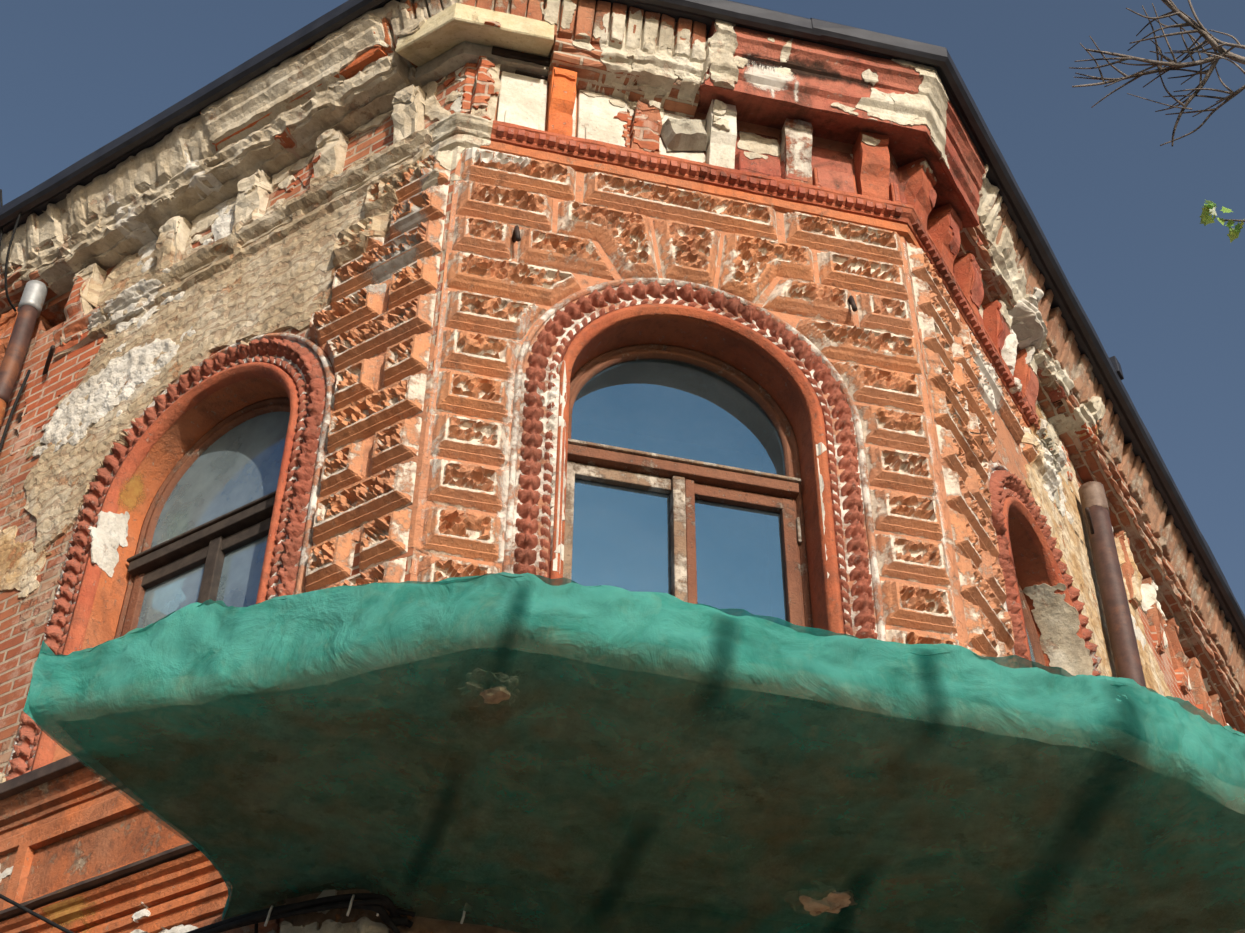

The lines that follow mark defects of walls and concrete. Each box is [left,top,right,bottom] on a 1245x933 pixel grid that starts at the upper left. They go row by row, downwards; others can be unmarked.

flaking render [152,56,499,244]
flaking render [374,0,421,59]
flaking render [540,0,780,160]
flaking render [767,37,794,76]
flaking render [830,59,949,181]
flaking render [977,164,1075,397]
flaking render [10,268,126,459]
peeling [112,410,129,447]
flaking render [1021,400,1102,524]
flaking render [1023,583,1094,676]
flaking render [1129,580,1212,716]
flaking render [0,864,13,882]